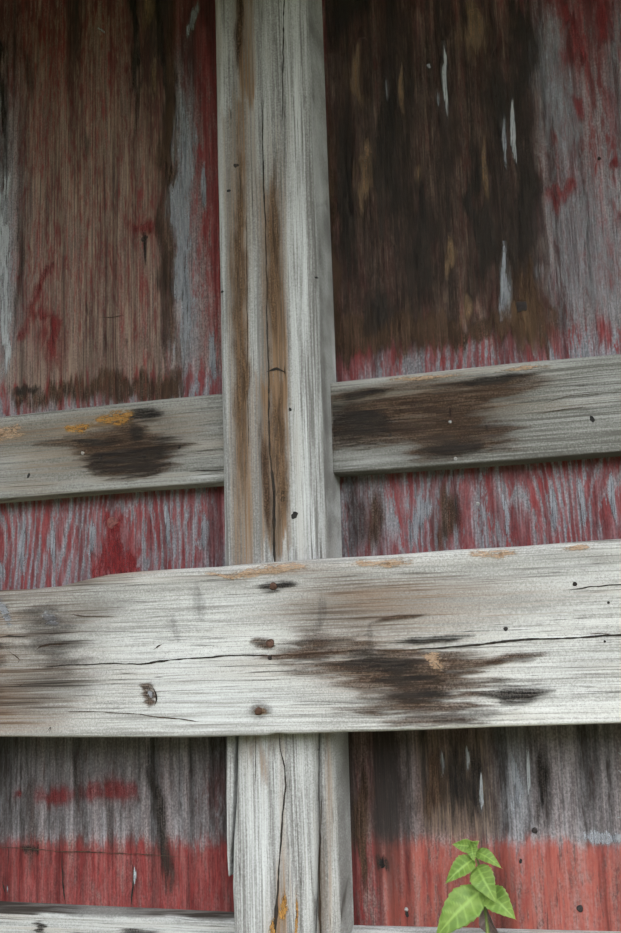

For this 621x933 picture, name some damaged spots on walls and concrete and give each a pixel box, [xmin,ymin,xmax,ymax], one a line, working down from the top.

peeling [437,50,448,113]
peeling [502,103,516,167]
leakage [326,0,543,370]
crack [240,0,285,562]
leakage [13,367,195,479]
leakage [331,373,546,461]
corrosion [259,581,296,593]
crack [0,635,299,722]
corrosion [251,638,275,648]
leakage [263,629,553,727]
crack [404,633,621,651]
crack [274,736,287,933]